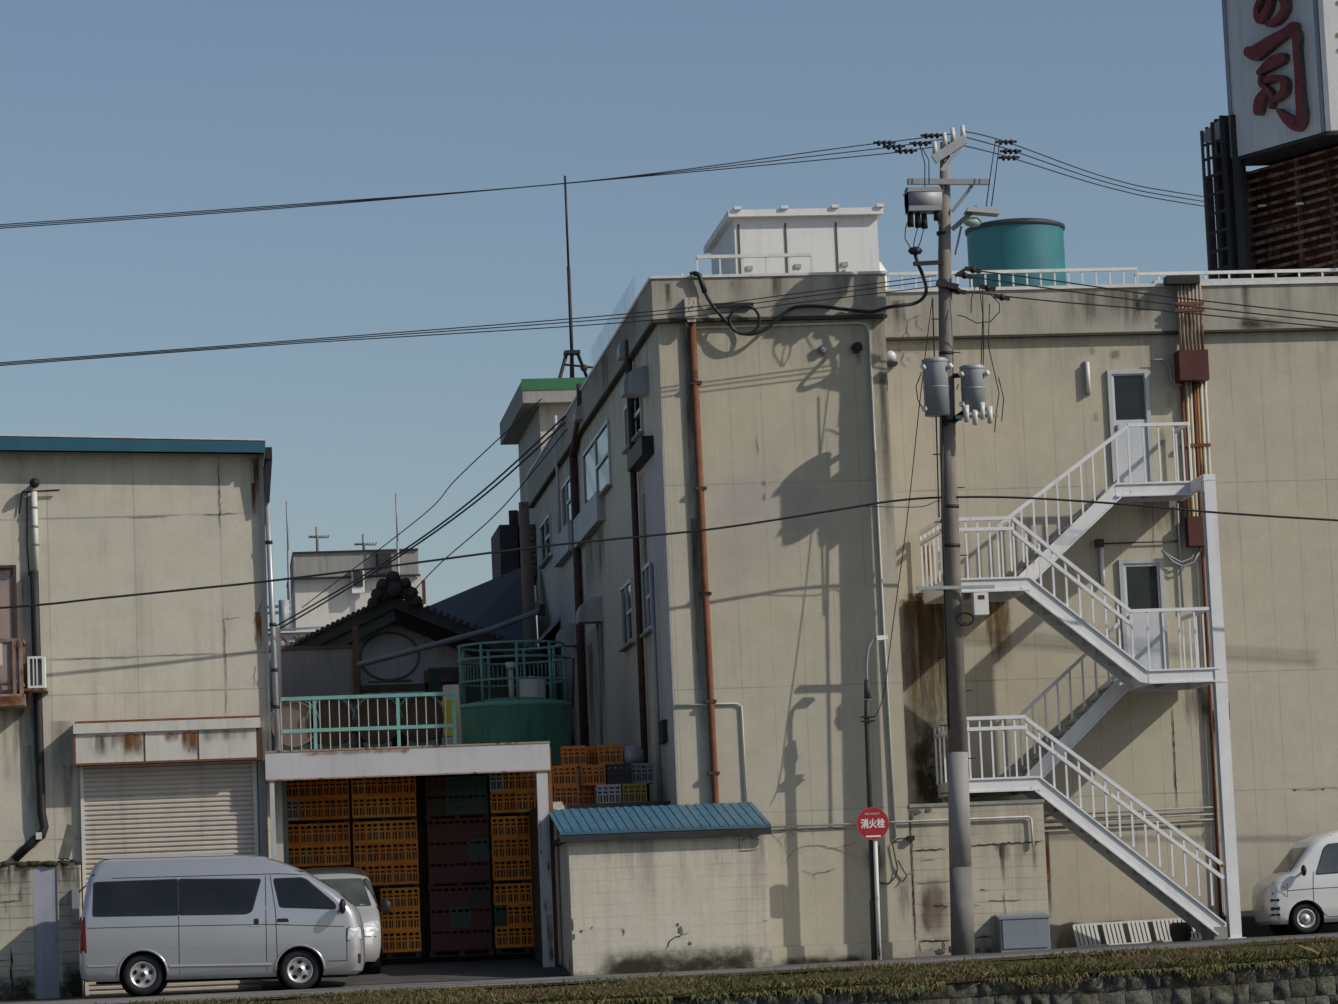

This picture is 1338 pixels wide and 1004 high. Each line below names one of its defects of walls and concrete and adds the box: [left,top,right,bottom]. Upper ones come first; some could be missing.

damp [904,600,946,707]
corrosion [122,734,141,750]
corrosion [167,731,198,747]
crack [738,827,856,880]